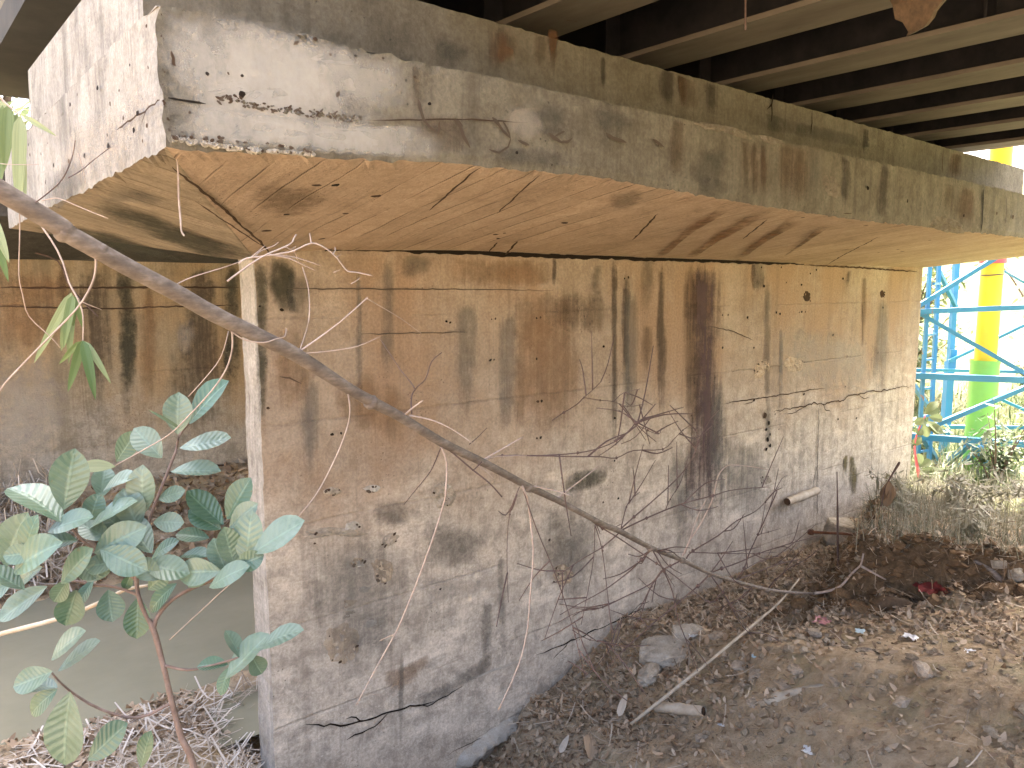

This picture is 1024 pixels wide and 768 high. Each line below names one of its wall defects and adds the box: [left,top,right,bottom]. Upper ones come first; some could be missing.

crack [117,97,206,130]
spalling [155,9,317,157]
peeling [215,94,362,124]
crack [430,167,482,210]
crack [325,214,917,272]
water stain [87,276,137,384]
water stain [613,270,628,400]
water stain [685,269,722,502]
crack [726,386,907,429]
water stain [574,471,605,489]
crack [537,601,649,659]
crack [306,687,461,740]